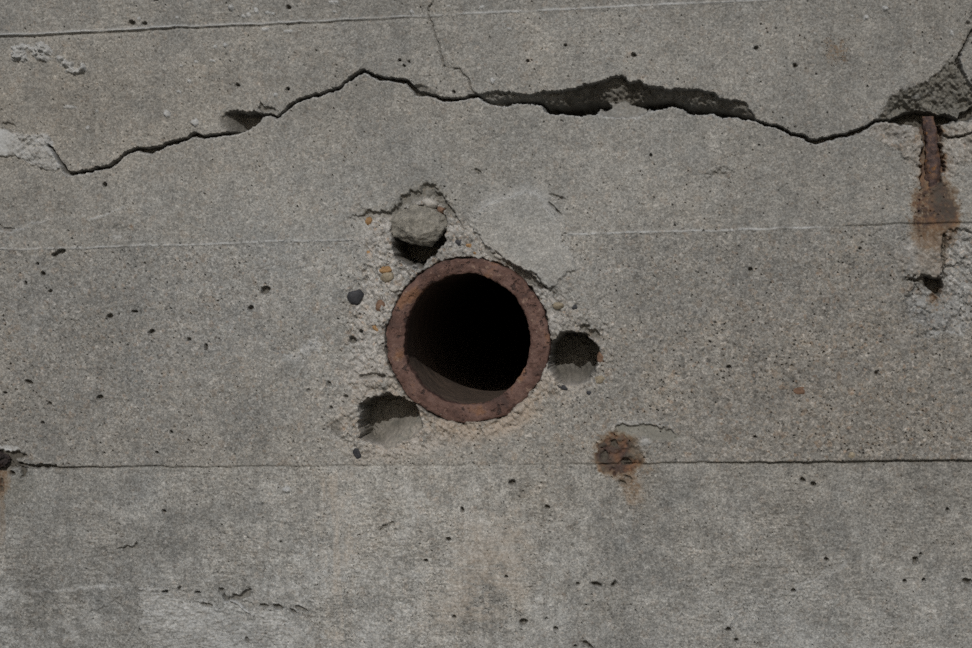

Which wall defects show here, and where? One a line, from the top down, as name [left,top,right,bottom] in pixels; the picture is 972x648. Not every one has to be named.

peeling [2,127,62,173]
crack [46,0,888,178]
spalling [867,12,972,194]
rust [908,176,964,239]
spalling [324,178,618,470]
spalling [893,223,972,340]
rust [592,430,661,510]